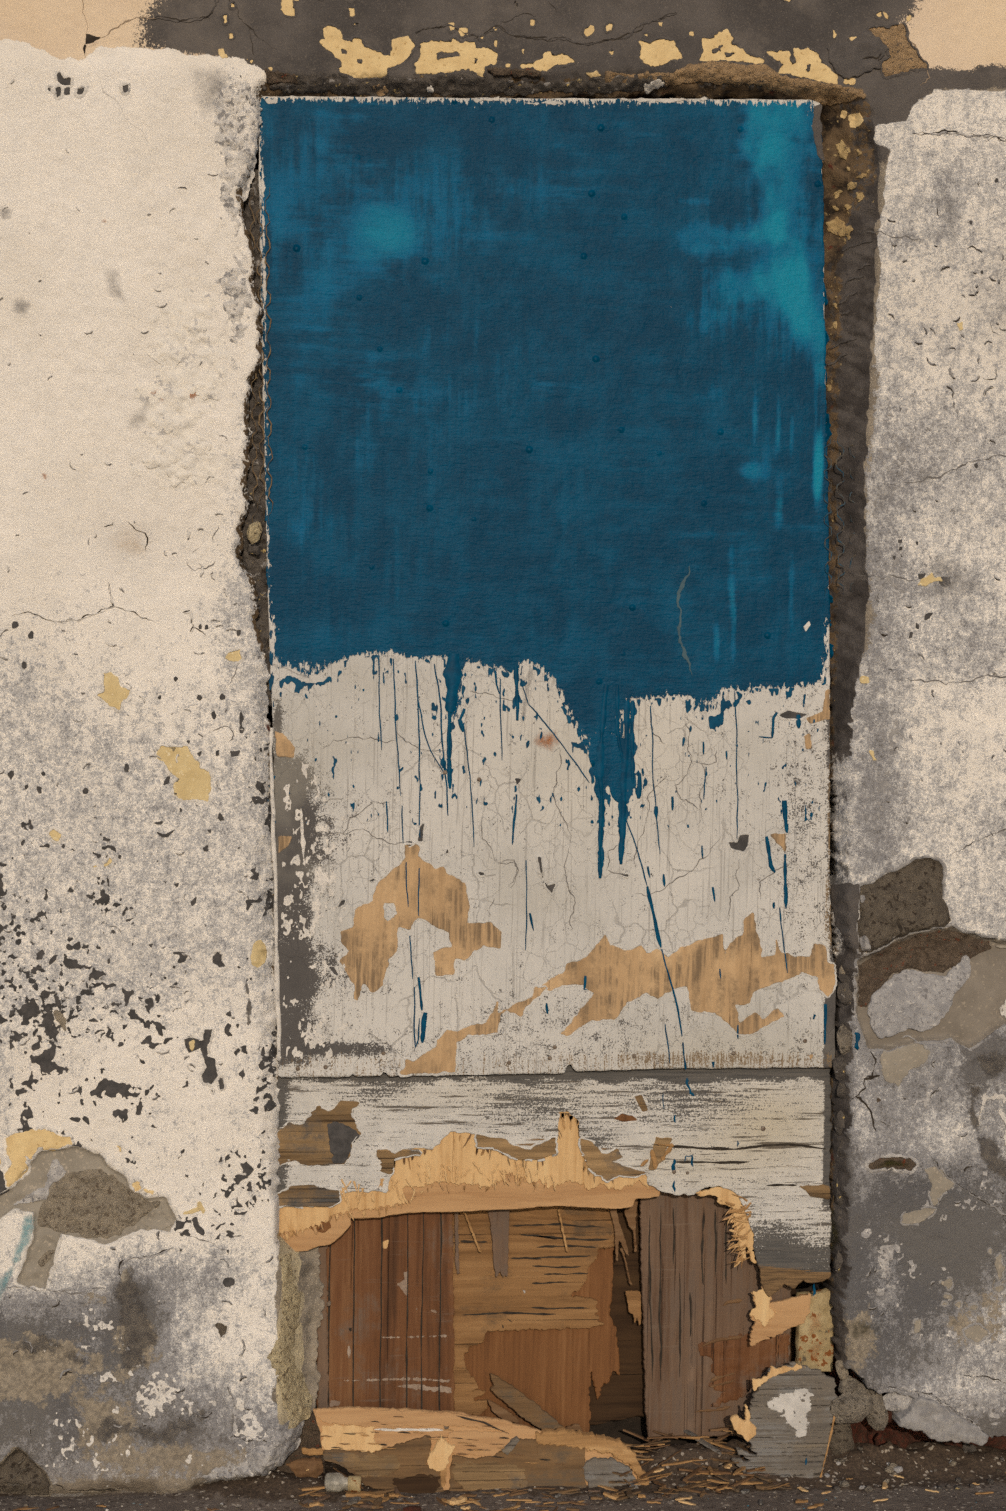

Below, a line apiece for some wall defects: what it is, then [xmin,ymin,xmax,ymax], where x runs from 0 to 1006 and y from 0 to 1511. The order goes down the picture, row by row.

spalling [240,0,930,240]
peeling [0,621,34,669]
peeling [0,770,59,793]
peeling [328,821,503,1002]
crack [481,821,519,914]
crack [553,751,576,927]
crack [607,725,791,916]
spalling [0,788,361,1308]
peeling [374,1147,422,1176]
peeling [397,911,1006,1446]
peeling [0,1308,279,1496]
peeling [427,1434,455,1487]